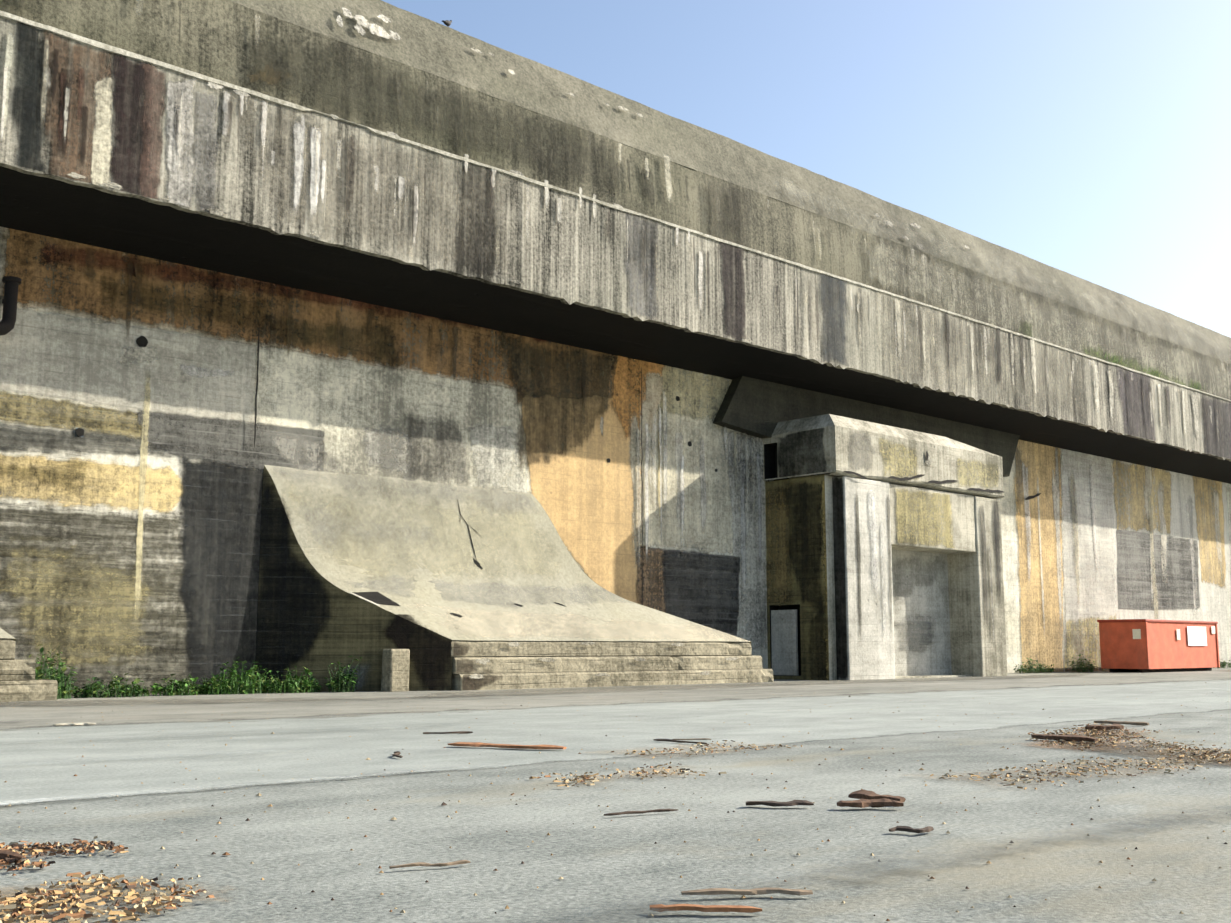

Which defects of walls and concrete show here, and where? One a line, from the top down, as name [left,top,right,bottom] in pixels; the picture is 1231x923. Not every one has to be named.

leakage [1,0,112,188]
corrosion [45,31,165,200]
spalling [336,7,400,40]
leakage [86,248,396,365]
corrosion [0,228,665,612]
leakage [364,327,617,493]
leakage [796,221,1231,459]
crack [456,495,479,563]
leakage [630,365,932,680]
leakage [981,501,1001,639]
leakage [1016,448,1231,671]